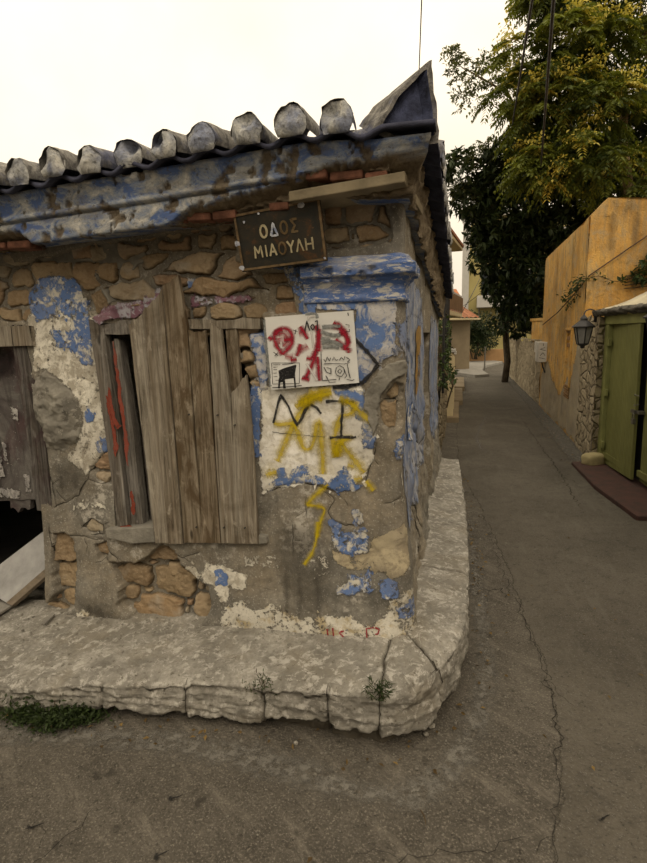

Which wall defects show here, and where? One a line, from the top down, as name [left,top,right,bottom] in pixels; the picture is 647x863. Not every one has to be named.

peeling [0,225,439,619]
crack [352,519,578,863]